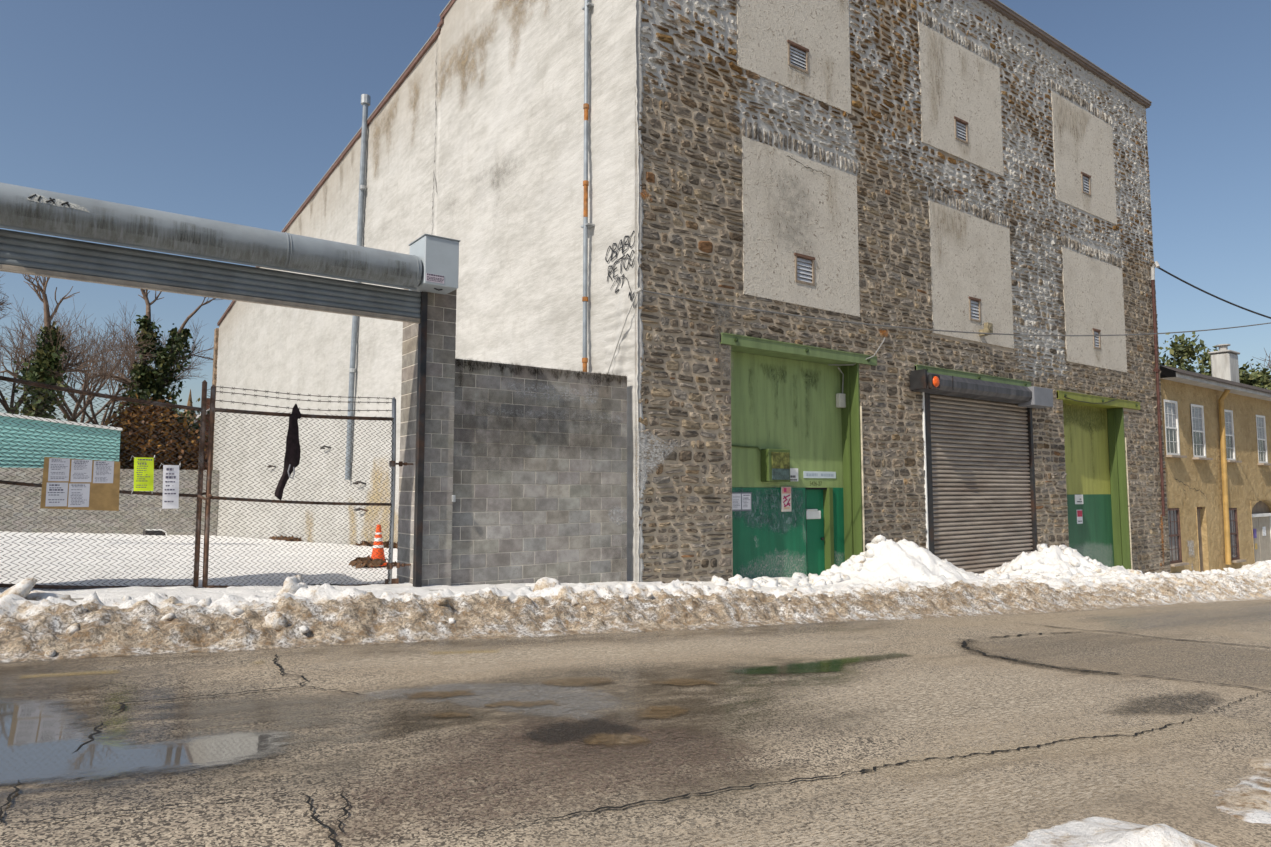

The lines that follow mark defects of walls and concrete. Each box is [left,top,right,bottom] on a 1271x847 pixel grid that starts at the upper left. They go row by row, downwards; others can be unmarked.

crack [74,654,366,752]
crack [444,621,1271,837]
crack [0,780,349,847]